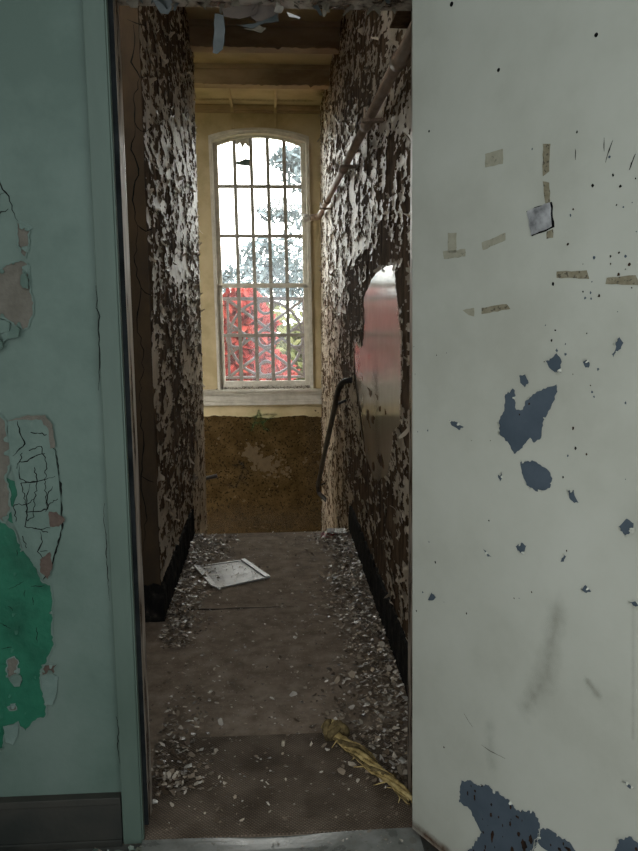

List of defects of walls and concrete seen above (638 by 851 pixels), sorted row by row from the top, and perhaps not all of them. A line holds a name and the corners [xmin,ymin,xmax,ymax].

peeling [0,414,65,750]
peeling [126,0,428,641]